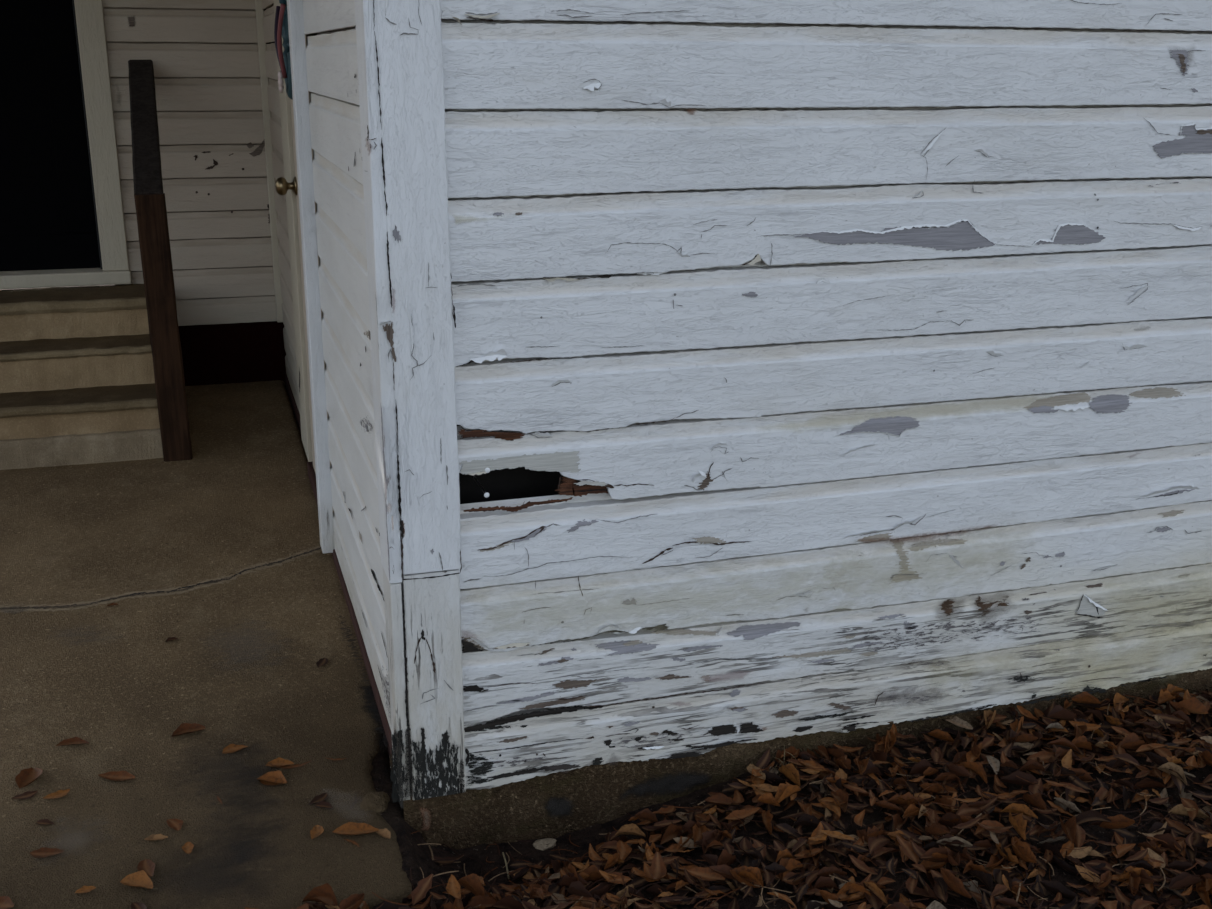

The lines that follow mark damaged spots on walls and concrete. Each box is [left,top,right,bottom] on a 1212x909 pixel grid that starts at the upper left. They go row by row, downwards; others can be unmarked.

peeling [1170,50,1205,76]
peeling [1145,119,1212,158]
peeling [762,219,1106,251]
peeling [1023,387,1184,413]
peeling [837,416,920,456]
peeling [1136,485,1201,534]
crack [0,545,321,612]
peeling [889,539,968,584]
spalling [991,552,1065,576]
peeling [461,614,1040,704]
spalling [604,721,698,750]
leakage [412,728,581,800]